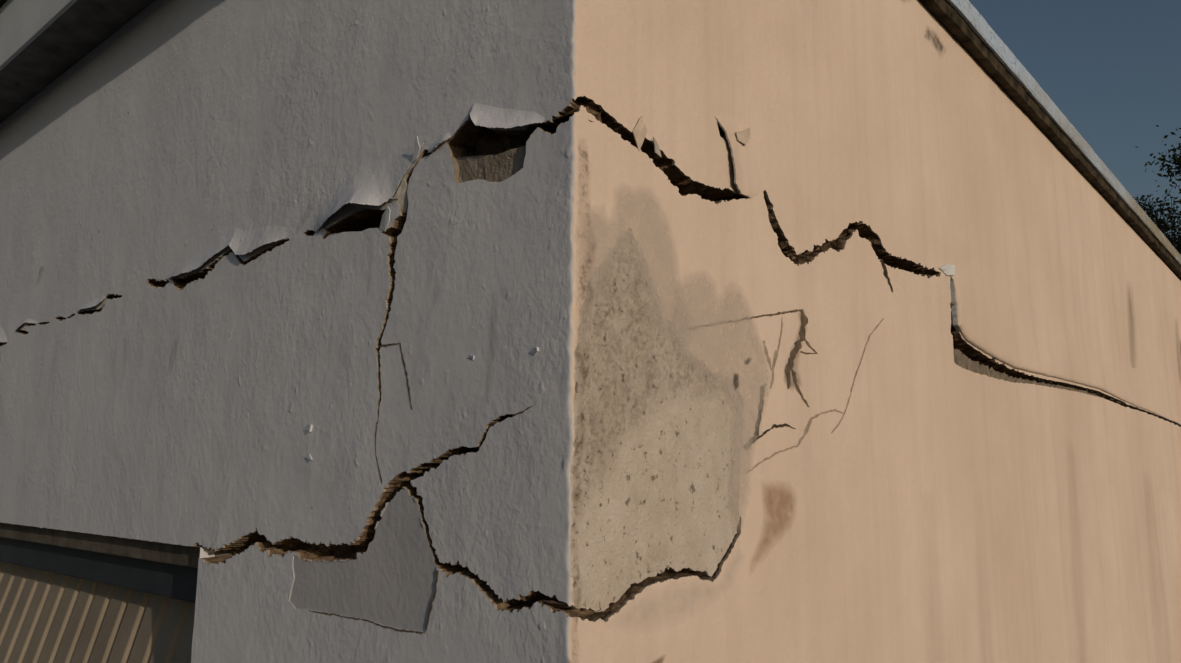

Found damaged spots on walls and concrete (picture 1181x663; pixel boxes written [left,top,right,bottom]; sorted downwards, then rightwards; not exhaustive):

peeling [289,488,437,632]
crack [0,136,741,634]
spalling [446,117,534,184]
flaking render [570,227,744,612]
crack [525,96,955,473]
crack [950,303,1181,427]